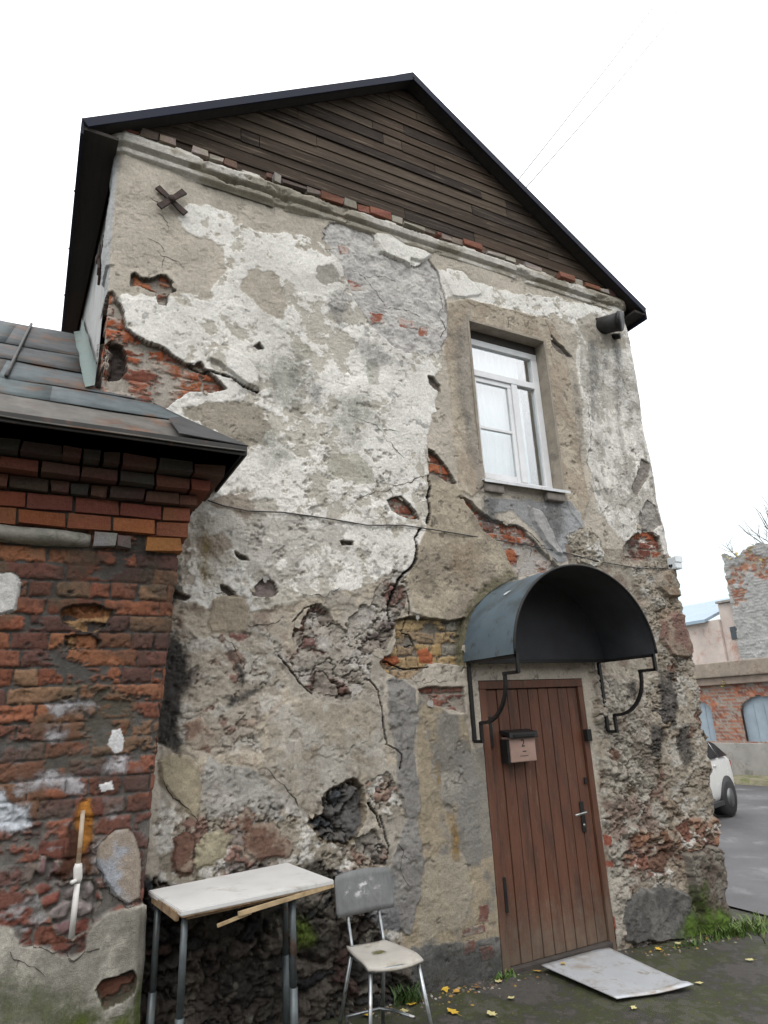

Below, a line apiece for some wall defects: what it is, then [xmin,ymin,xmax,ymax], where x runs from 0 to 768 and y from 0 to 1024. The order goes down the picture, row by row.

spalling [130,271,177,306]
spalling [96,290,228,408]
crack [352,270,446,338]
spalling [387,495,420,519]
spalling [427,448,457,484]
spalling [459,496,605,577]
spalling [623,458,664,566]
crack [349,414,456,769]
spalling [289,569,466,713]
leakage [157,636,192,753]
spalling [308,770,405,866]
spalling [96,969,138,1009]